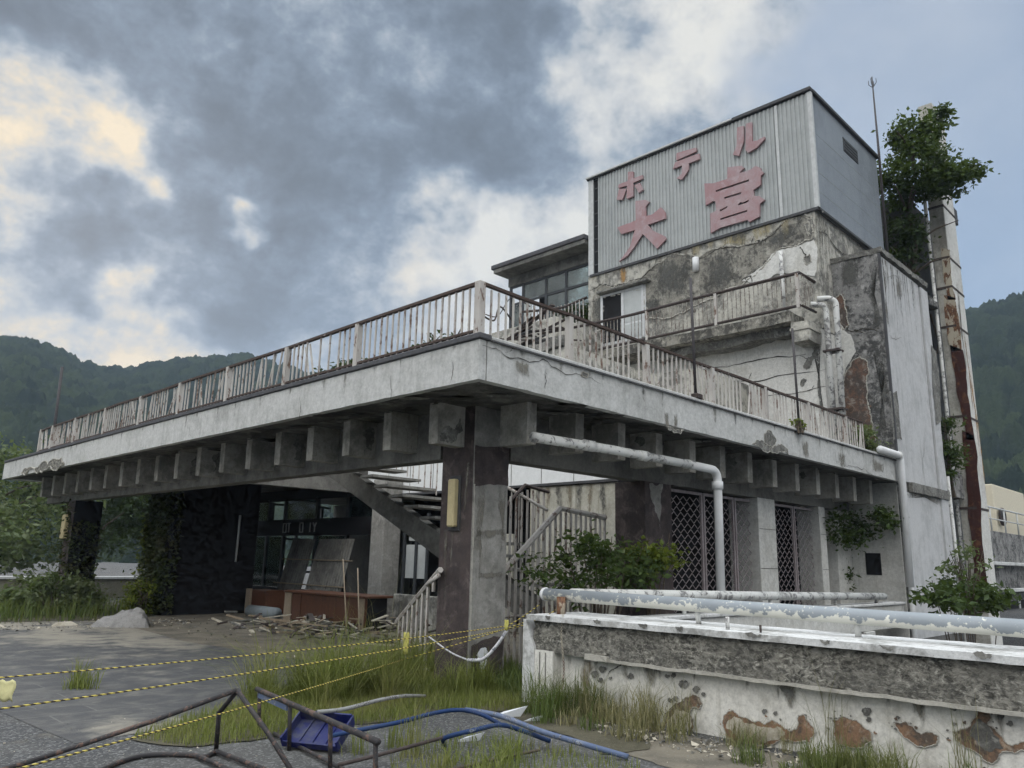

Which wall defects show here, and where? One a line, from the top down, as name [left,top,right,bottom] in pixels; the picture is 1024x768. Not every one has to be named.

crack [700,219,788,259]
spalling [591,210,824,331]
spalling [835,289,849,330]
crack [484,345,594,384]
spalling [844,354,876,441]
corrosion [941,248,987,584]
spalling [21,457,81,479]
peeling [752,430,789,466]
peeling [665,673,706,732]
peeling [720,707,877,749]
peeling [888,708,1024,768]